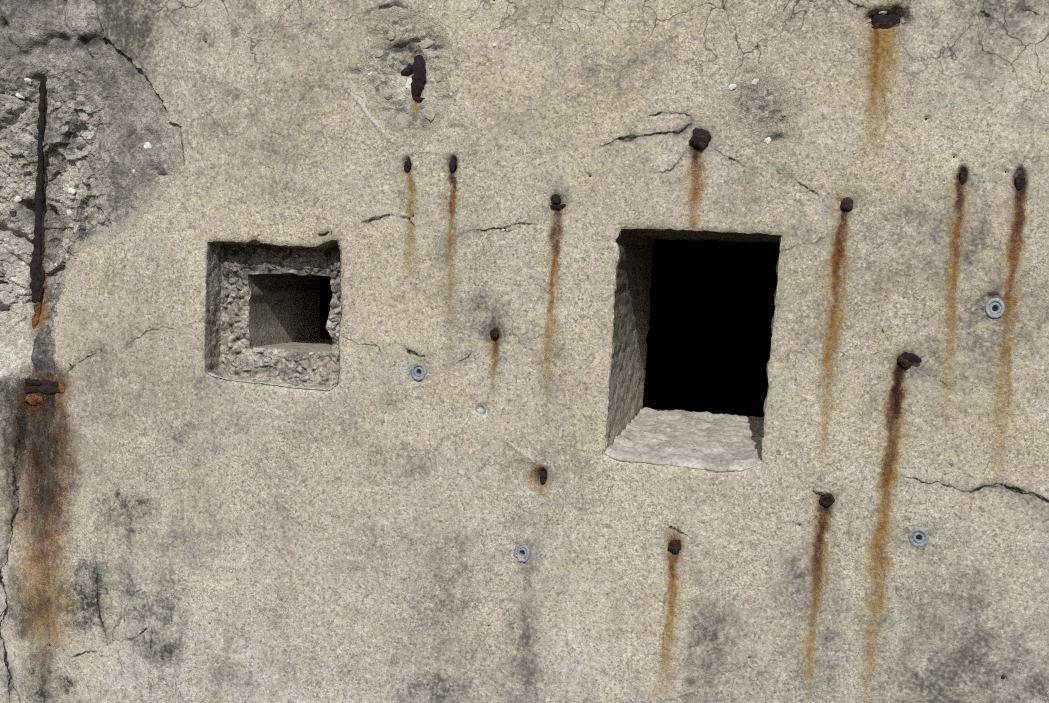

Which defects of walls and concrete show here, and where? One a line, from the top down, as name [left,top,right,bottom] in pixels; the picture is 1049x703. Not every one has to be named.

corrosion [29,81,49,329]
spalling [0,0,184,381]
spalling [356,5,454,145]
corrosion [546,203,562,344]
crack [604,112,693,145]
corrosion [824,209,848,386]
corrosion [1004,181,1027,322]
crack [0,416,23,701]
corrosion [8,371,74,637]
corrosion [808,504,831,657]
corrosion [871,362,906,615]
crack [908,477,1049,503]